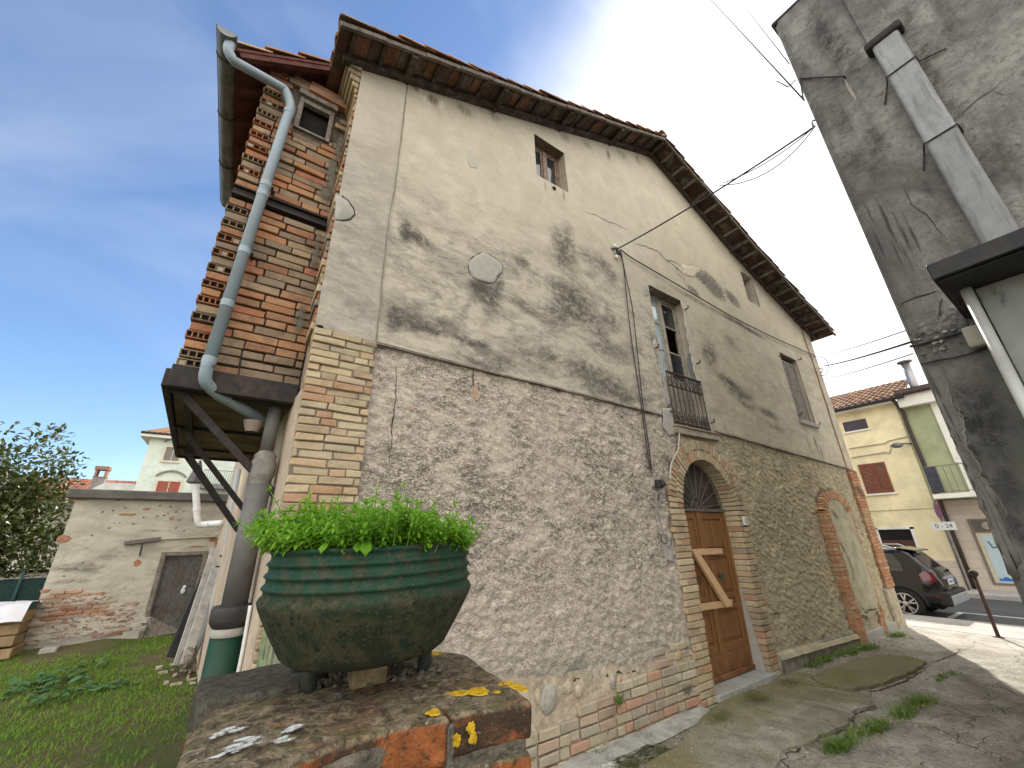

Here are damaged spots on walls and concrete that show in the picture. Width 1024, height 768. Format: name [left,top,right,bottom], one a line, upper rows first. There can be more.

crack [903,187,947,239]
damp [389,307,501,370]
damp [472,281,503,306]
damp [551,289,599,334]
crack [389,367,397,463]
flaking render [913,307,1022,579]
spalling [24,589,139,645]